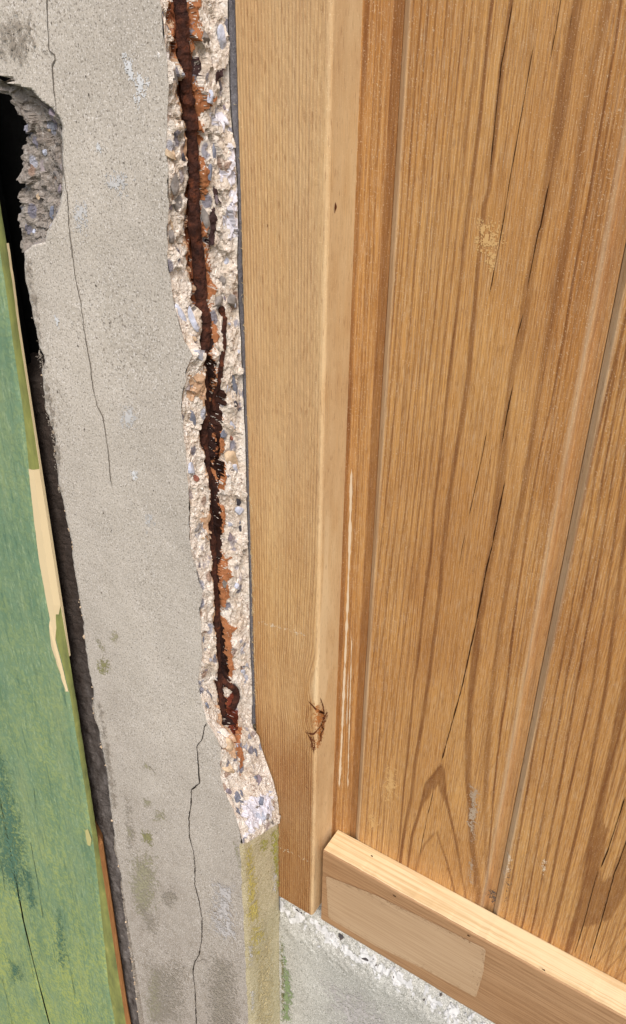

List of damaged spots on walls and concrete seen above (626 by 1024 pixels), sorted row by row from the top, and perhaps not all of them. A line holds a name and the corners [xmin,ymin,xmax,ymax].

spalling [0,78,71,692]
crack [45,0,111,481]
rust [166,0,245,776]
spalling [157,0,281,844]
crack [188,723,207,1024]